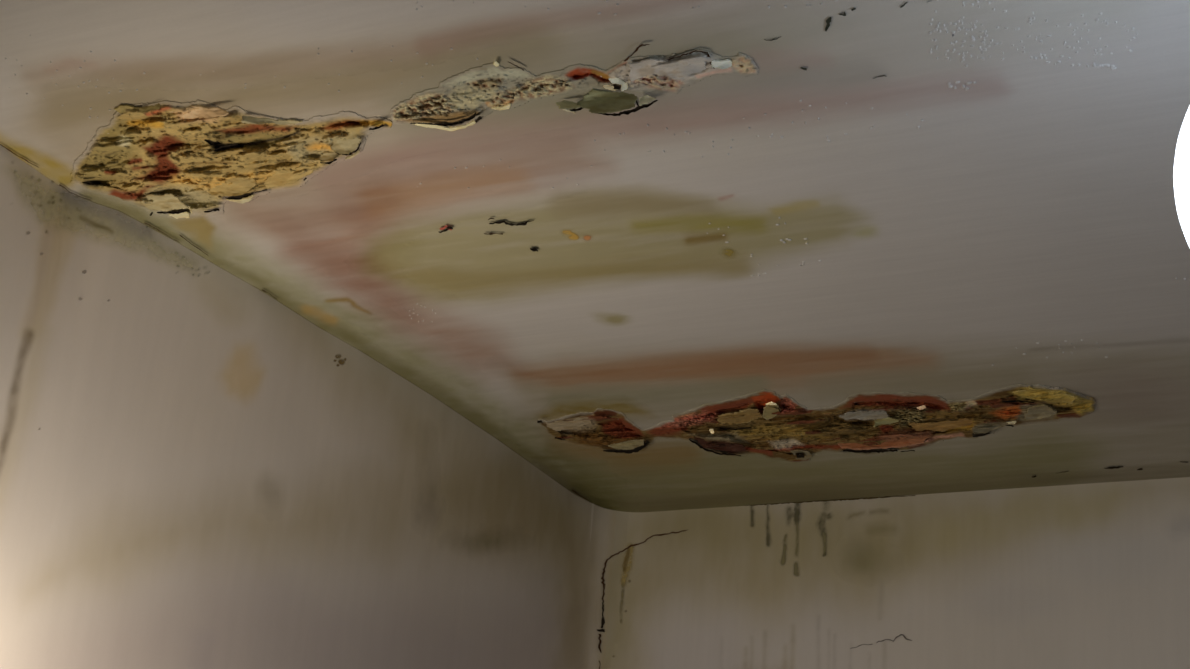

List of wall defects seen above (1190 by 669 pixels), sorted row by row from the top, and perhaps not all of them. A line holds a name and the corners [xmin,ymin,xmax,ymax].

flaking render [70,44,759,220]
flaking render [537,384,1096,464]
crack [597,530,687,669]
leakage [781,503,800,576]